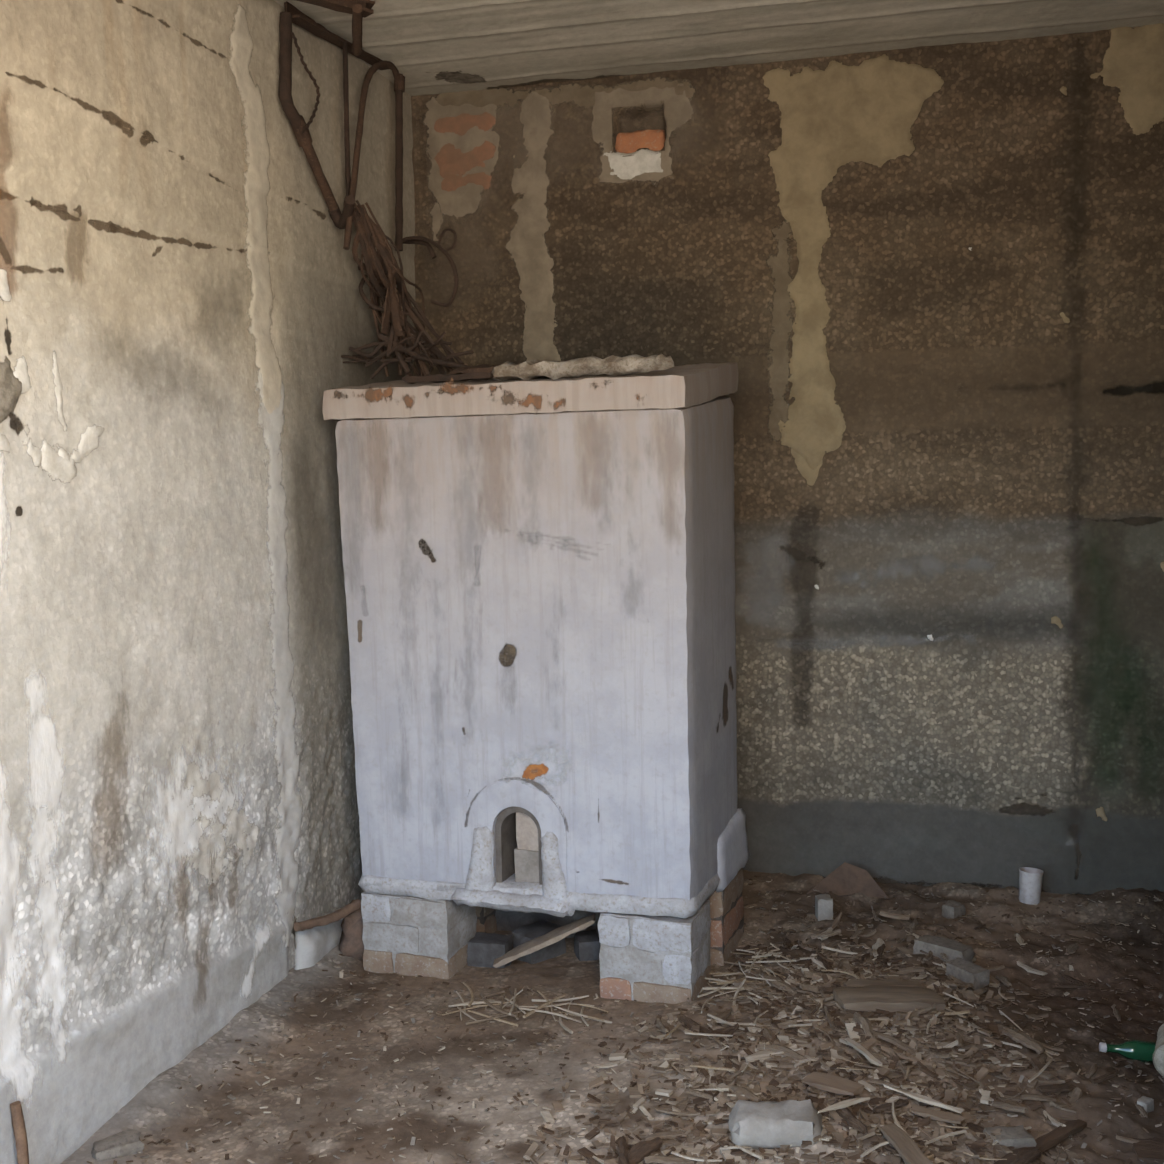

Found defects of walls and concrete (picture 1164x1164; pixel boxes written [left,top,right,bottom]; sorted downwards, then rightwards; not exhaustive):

crack [6,72,184,160]
crack [0,189,269,256]
crack [287,197,326,220]
spalling [423,97,501,241]
peeling [591,84,694,185]
peeling [0,351,104,483]
crack [1104,516,1164,526]
water stain [146,748,260,898]
water stain [0,674,68,1105]
water stain [242,924,270,999]